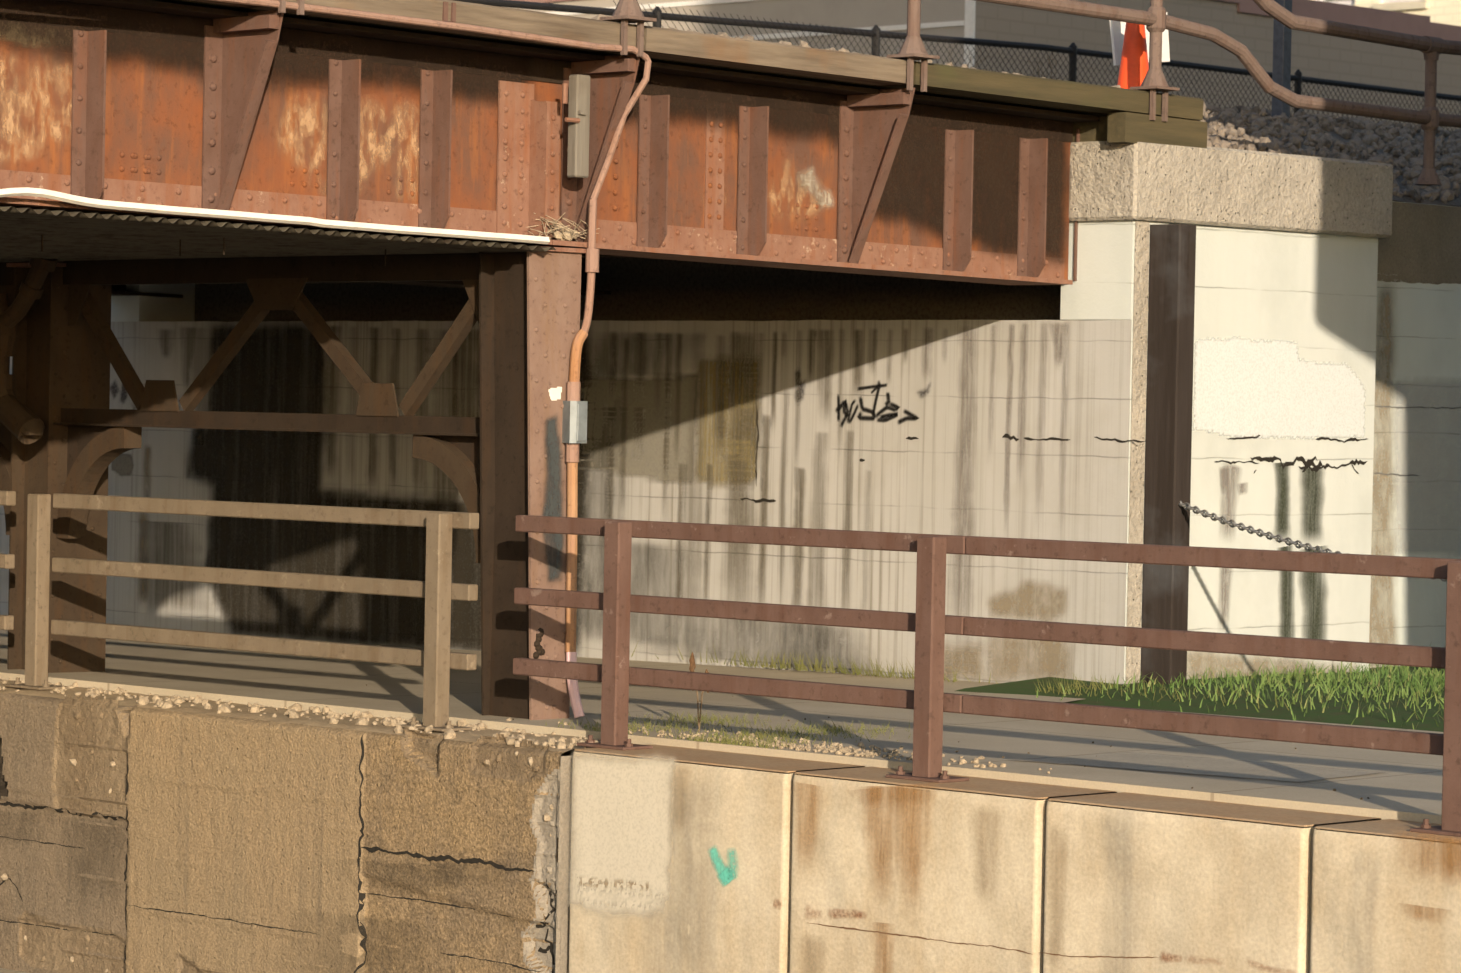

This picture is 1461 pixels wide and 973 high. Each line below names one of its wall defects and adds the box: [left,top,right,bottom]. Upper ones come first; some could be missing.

rust [0,63,72,156]
rust [287,108,322,165]
rust [359,113,419,178]
damp [698,333,777,526]
damp [1276,463,1323,552]
damp [1221,568,1229,620]
damp [1281,571,1324,639]
damp [944,639,1066,677]
hole [0,738,8,799]
crack [0,751,315,971]
crack [354,735,556,973]
spalling [468,734,561,973]